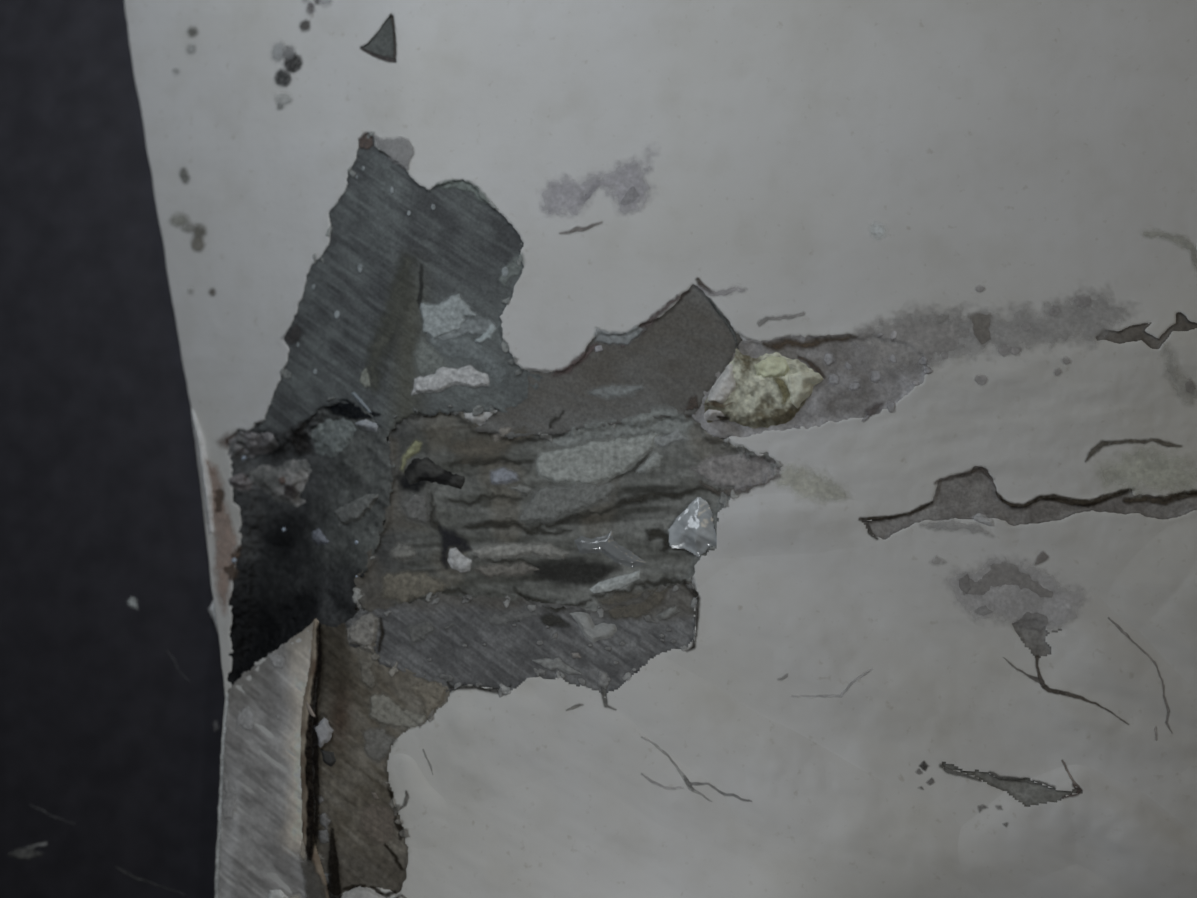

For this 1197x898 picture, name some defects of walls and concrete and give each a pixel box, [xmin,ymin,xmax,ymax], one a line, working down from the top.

flaking render [360,14,397,63]
mould [273,44,302,109]
damp [543,162,648,234]
flaking render [1096,312,1197,349]
flaking render [208,132,932,898]
crack [1006,655,1126,723]
crack [1108,618,1172,740]
flaking render [917,760,1083,812]